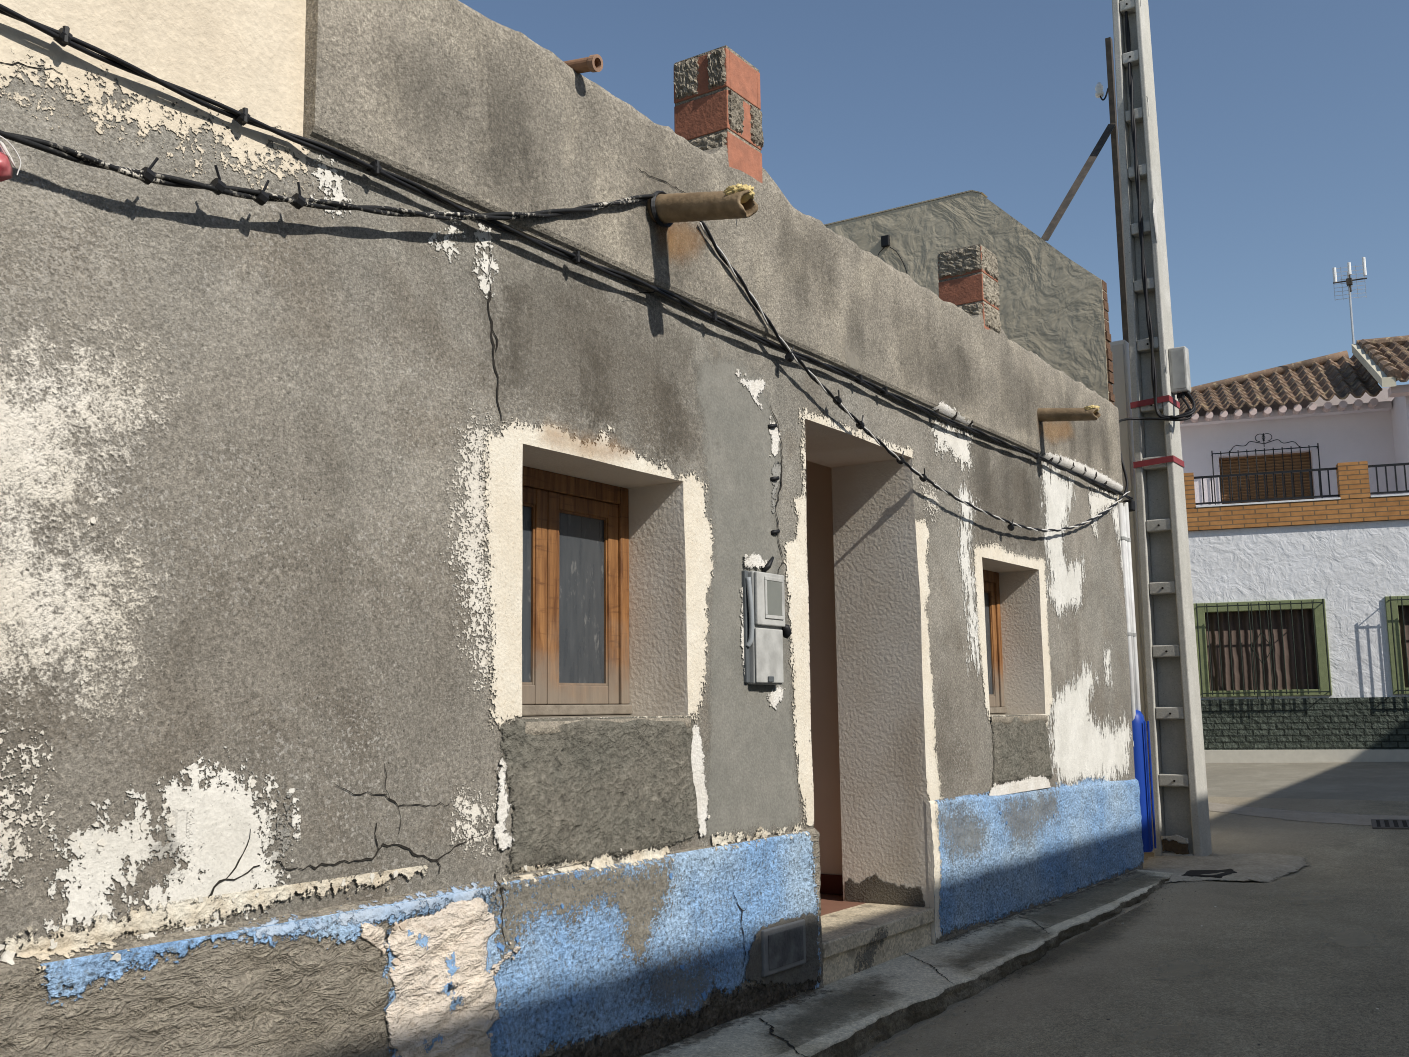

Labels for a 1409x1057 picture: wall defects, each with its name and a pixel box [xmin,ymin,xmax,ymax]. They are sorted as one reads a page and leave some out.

crack [486,225,502,421]
peeling [1039,452,1128,631]
peeling [0,300,821,1057]
peeling [935,643,1134,866]
crack [208,763,506,945]
crack [759,1018,808,1057]